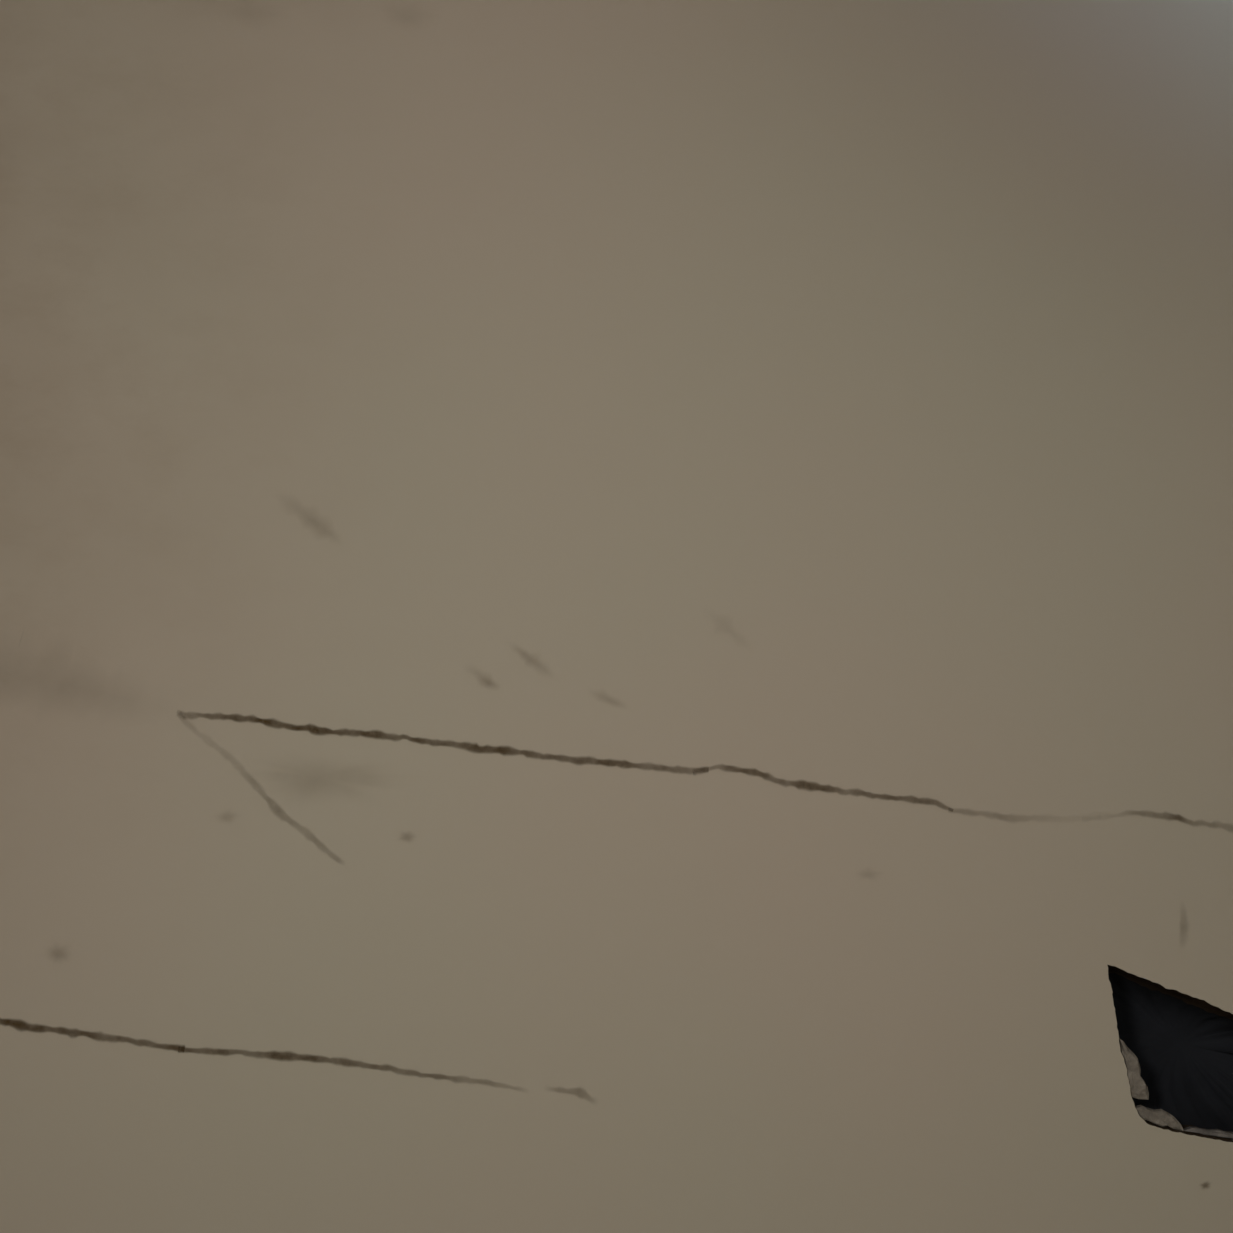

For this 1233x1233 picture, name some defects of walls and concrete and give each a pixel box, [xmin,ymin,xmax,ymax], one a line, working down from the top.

crack [220,715,666,769]
crack [727,766,834,791]
crack [863,792,929,803]
crack [0,1019,229,1054]
crack [259,1052,376,1068]
flaking render [1108,965,1233,1142]